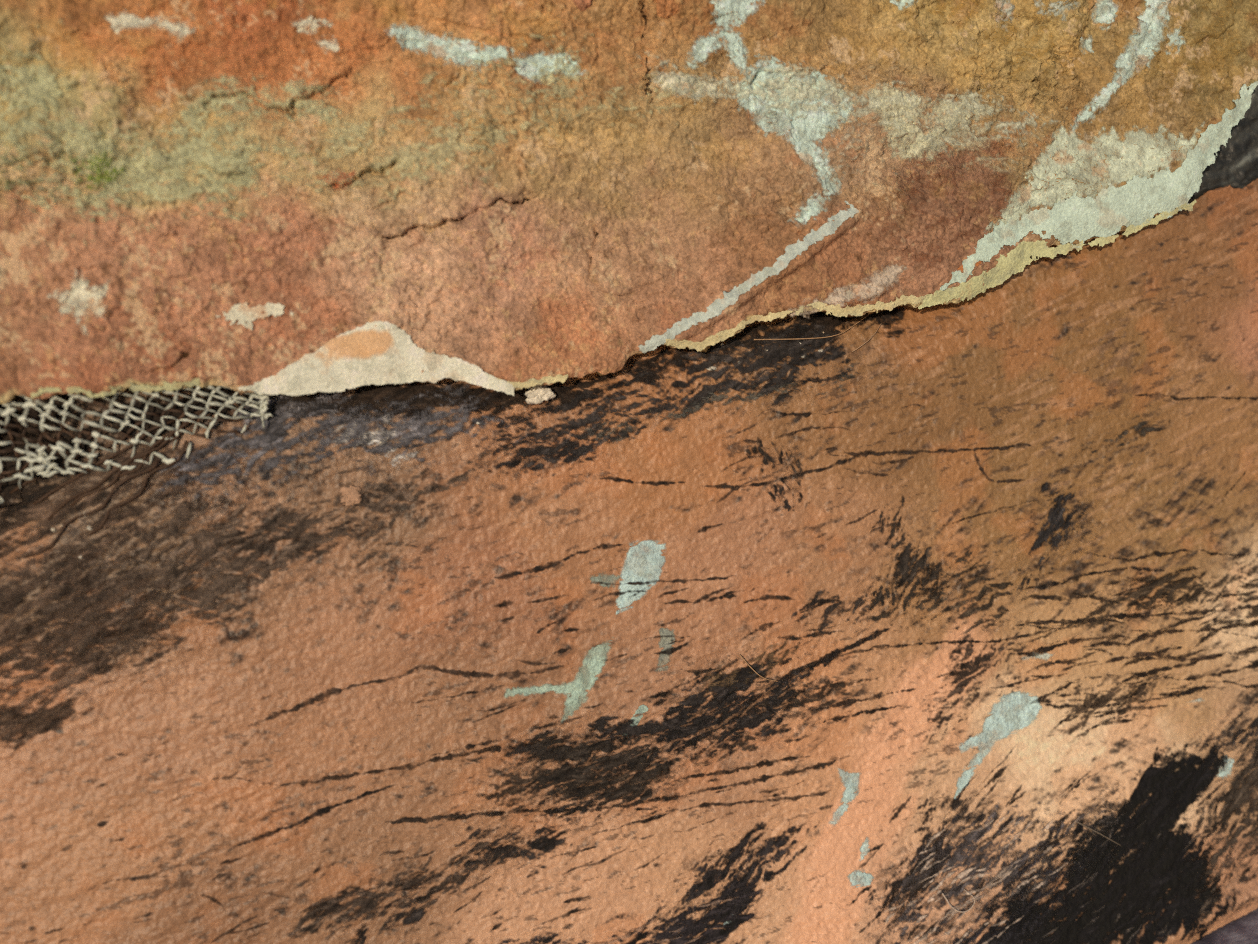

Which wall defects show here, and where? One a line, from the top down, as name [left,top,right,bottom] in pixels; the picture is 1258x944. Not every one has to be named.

peeling [638,0,1258,353]
peeling [31,378,200,398]
peeling [237,321,568,396]
water stain [0,307,905,751]
water stain [286,764,413,786]
water stain [429,629,853,820]
water stain [913,482,1258,929]
water stain [386,873,451,903]
water stain [492,912,587,944]
water stain [605,822,817,944]